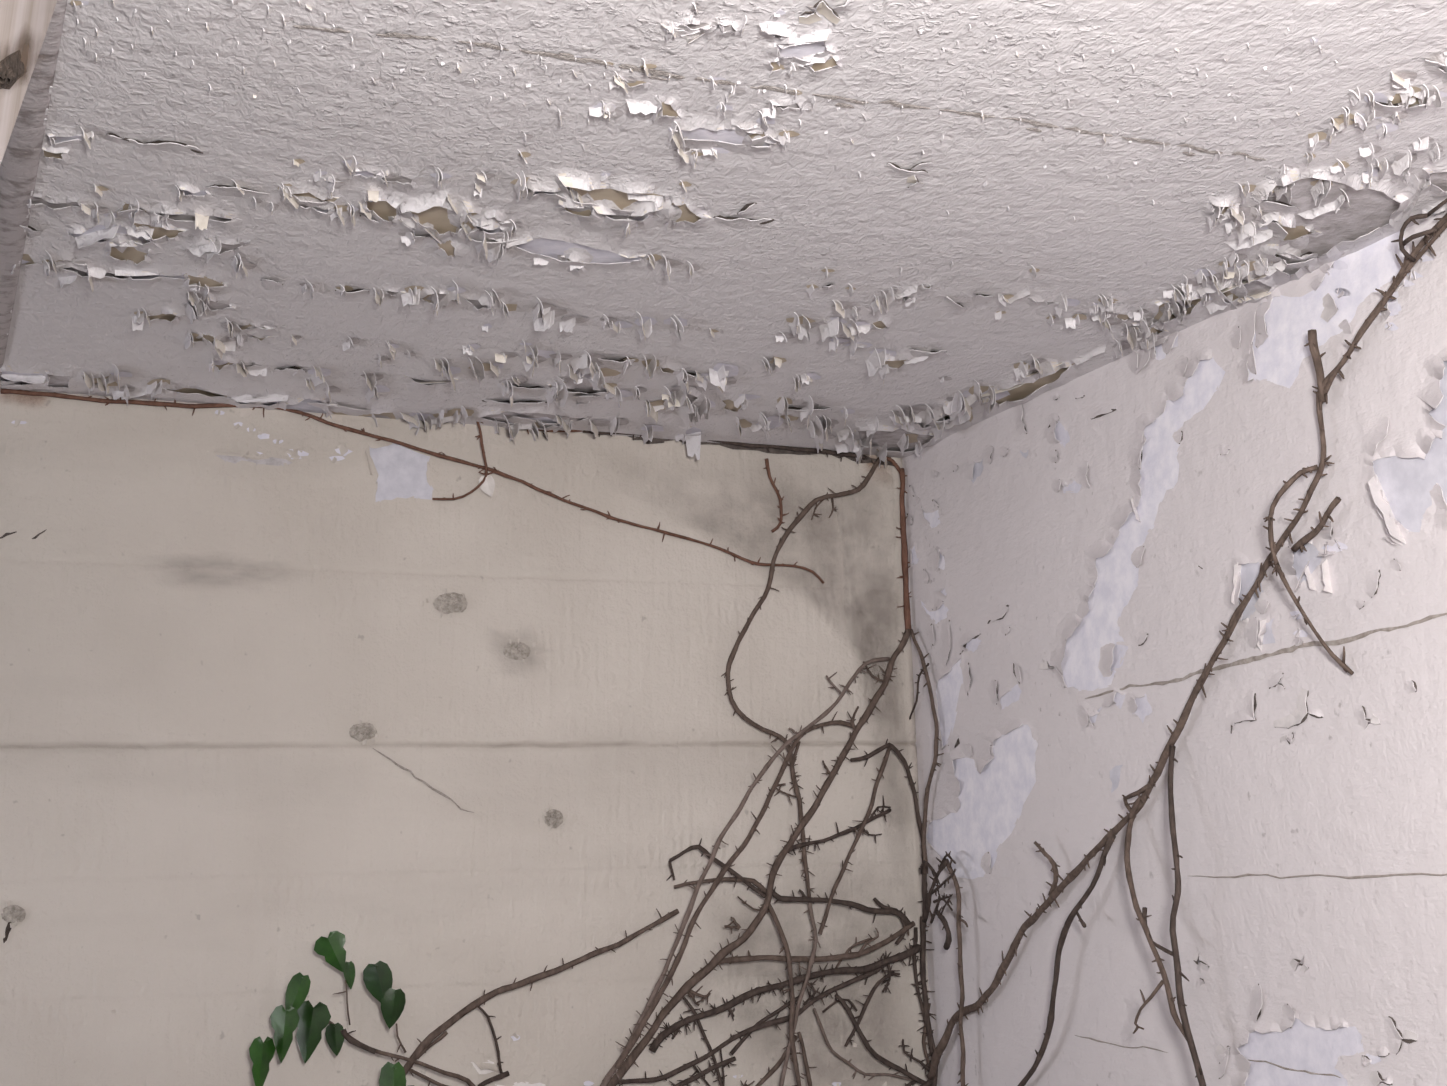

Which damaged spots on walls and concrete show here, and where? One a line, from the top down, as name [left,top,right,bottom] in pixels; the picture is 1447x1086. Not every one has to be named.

peeling [589,3,844,169]
crack [293,25,1266,161]
peeling [0,48,1447,732]
spalling [349,719,378,745]
peeling [905,485,1042,879]
crack [1085,559,1447,744]
spalling [542,806,563,832]
crack [1198,872,1447,880]
peeling [1225,984,1381,1086]